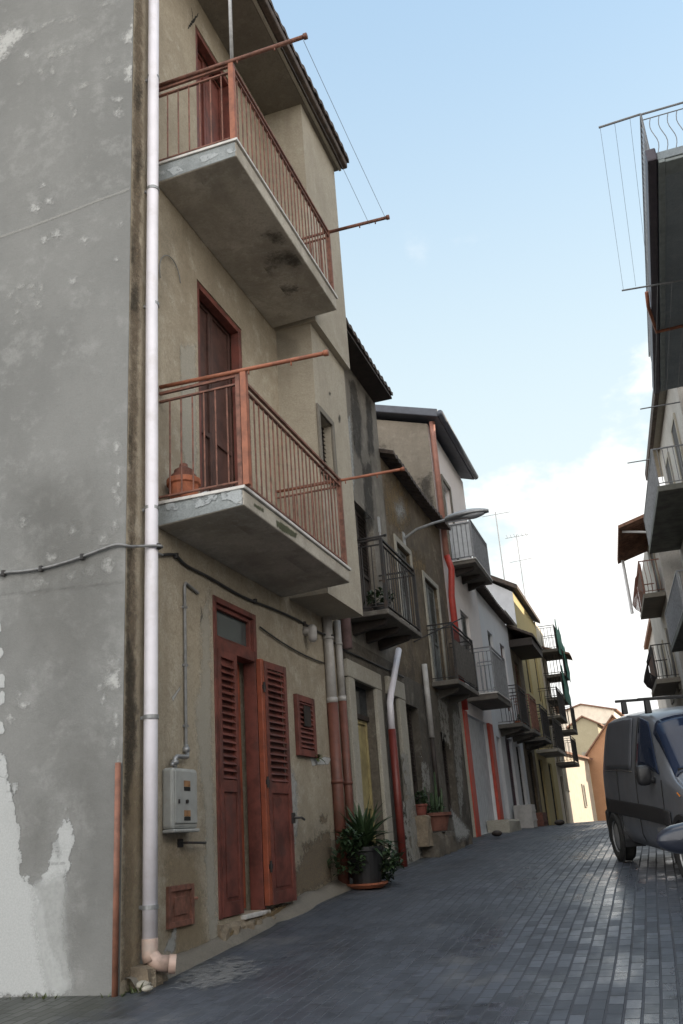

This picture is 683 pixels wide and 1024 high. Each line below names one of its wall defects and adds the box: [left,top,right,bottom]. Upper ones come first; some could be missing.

peeling [193,489,243,508]
water stain [339,381,374,534]
peeling [0,674,28,734]
peeling [0,753,75,998]